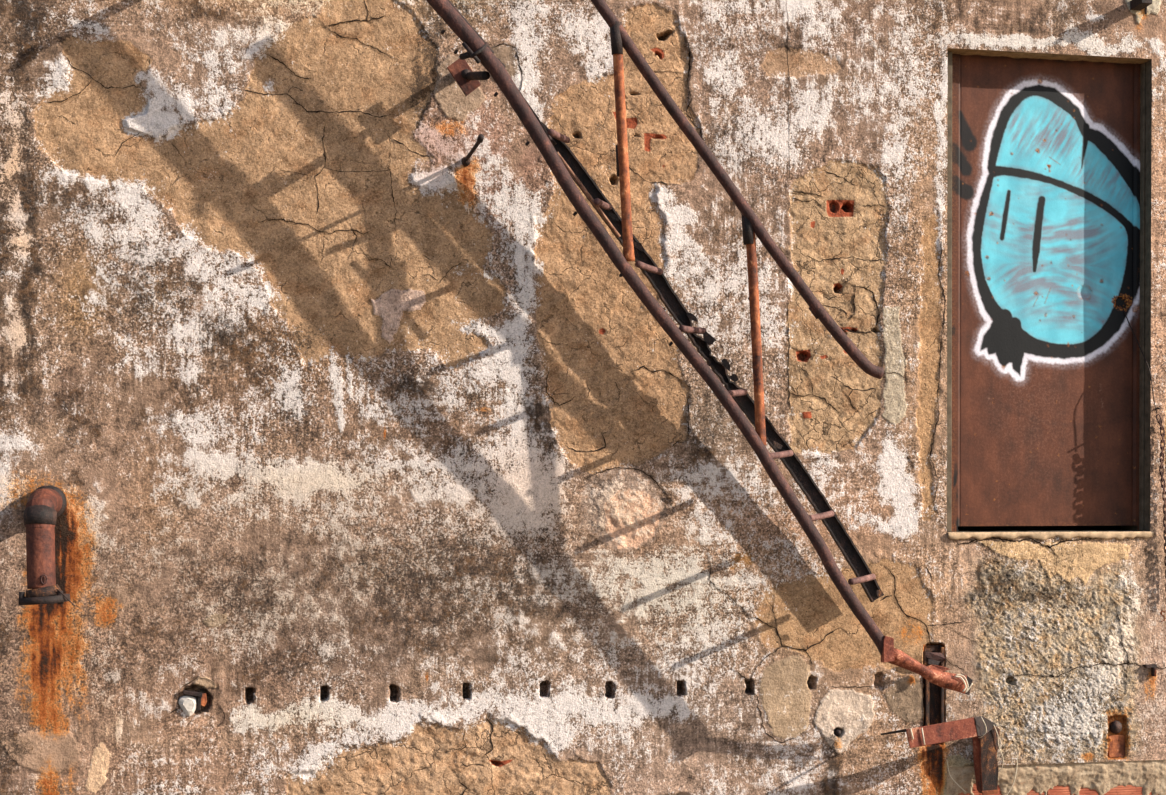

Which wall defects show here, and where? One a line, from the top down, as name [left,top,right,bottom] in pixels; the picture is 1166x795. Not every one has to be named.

damp [0,0,42,107]
damp [0,122,45,461]
spalling [0,0,703,543]
spalling [753,25,1166,676]
rust [0,463,127,795]
spalling [221,679,691,795]
rust [908,741,954,795]
crack [1003,609,1166,697]